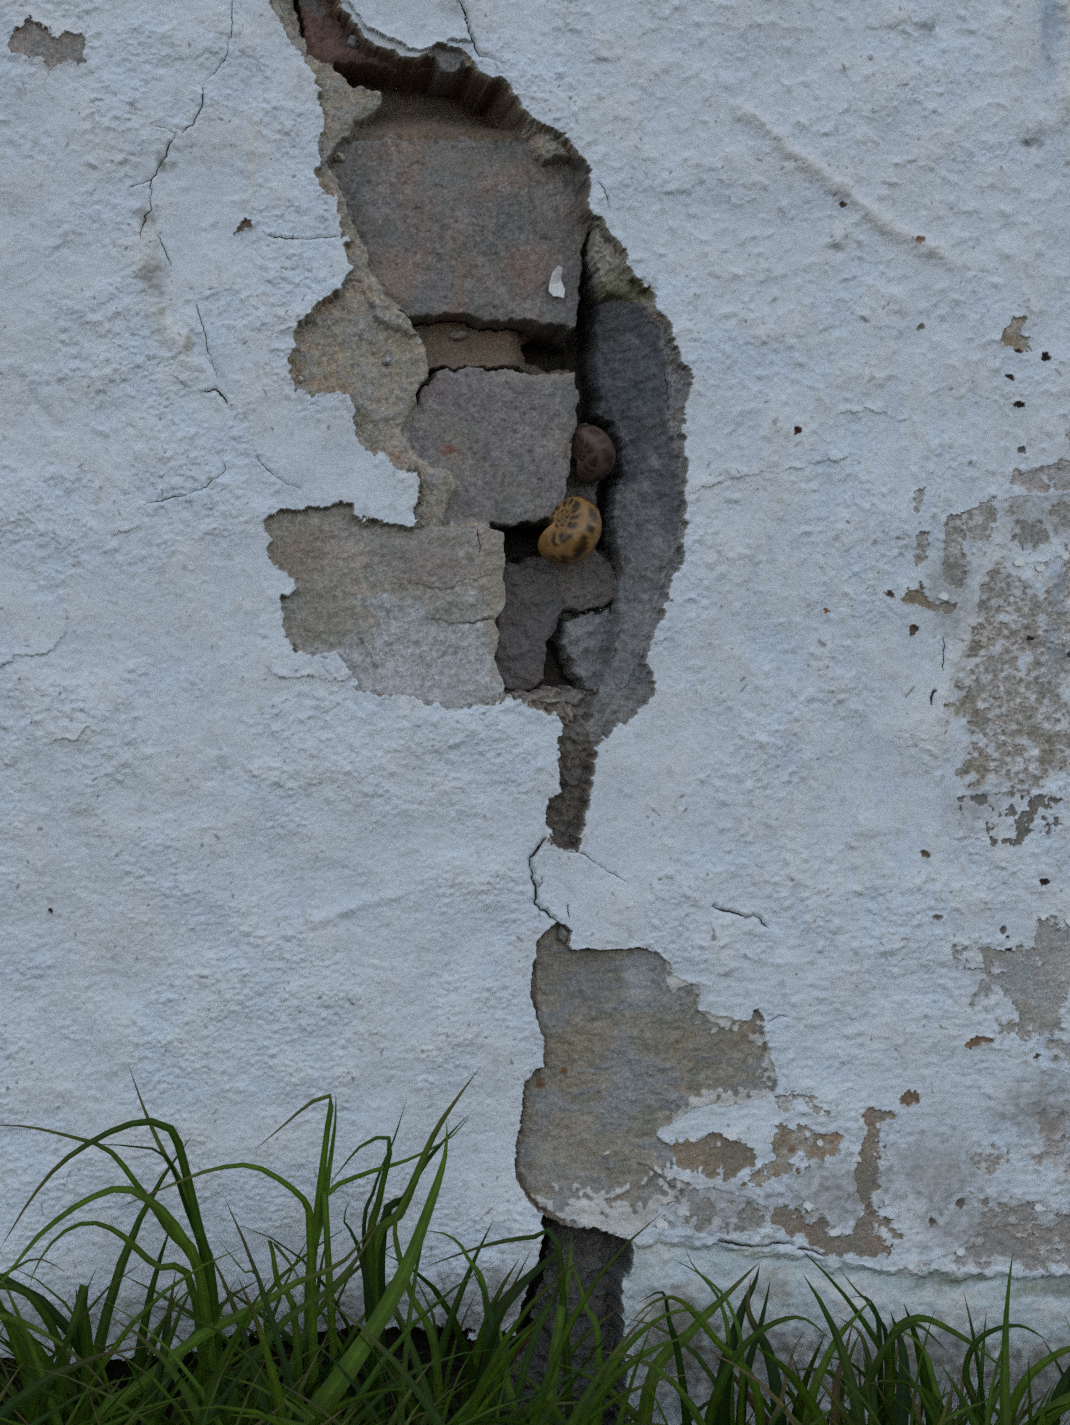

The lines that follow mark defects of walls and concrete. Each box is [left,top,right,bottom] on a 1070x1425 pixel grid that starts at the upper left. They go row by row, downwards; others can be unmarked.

peeling [7,17,87,68]
crack [458,0,500,62]
crack [132,11,233,267]
crack [267,232,340,240]
crack [197,308,228,405]
peeling [999,315,1052,361]
spalling [262,0,695,853]
crack [146,454,296,504]
peeling [883,429,1070,848]
crack [529,838,625,922]
peeling [951,914,1070,1071]
spalling [500,922,921,1425]